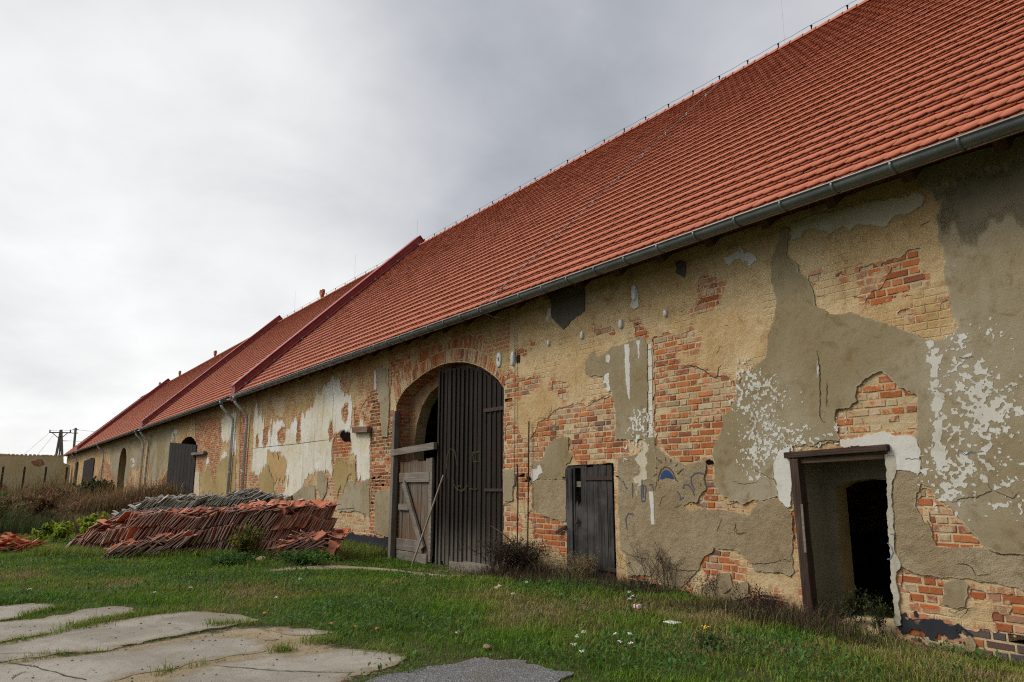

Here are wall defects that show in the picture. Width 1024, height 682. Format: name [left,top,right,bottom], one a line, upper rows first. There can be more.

flaking render [854,248,925,318]
flaking render [239,395,301,490]
flaking render [315,317,1024,557]
flaking render [701,550,738,590]
flaking render [901,567,1024,663]